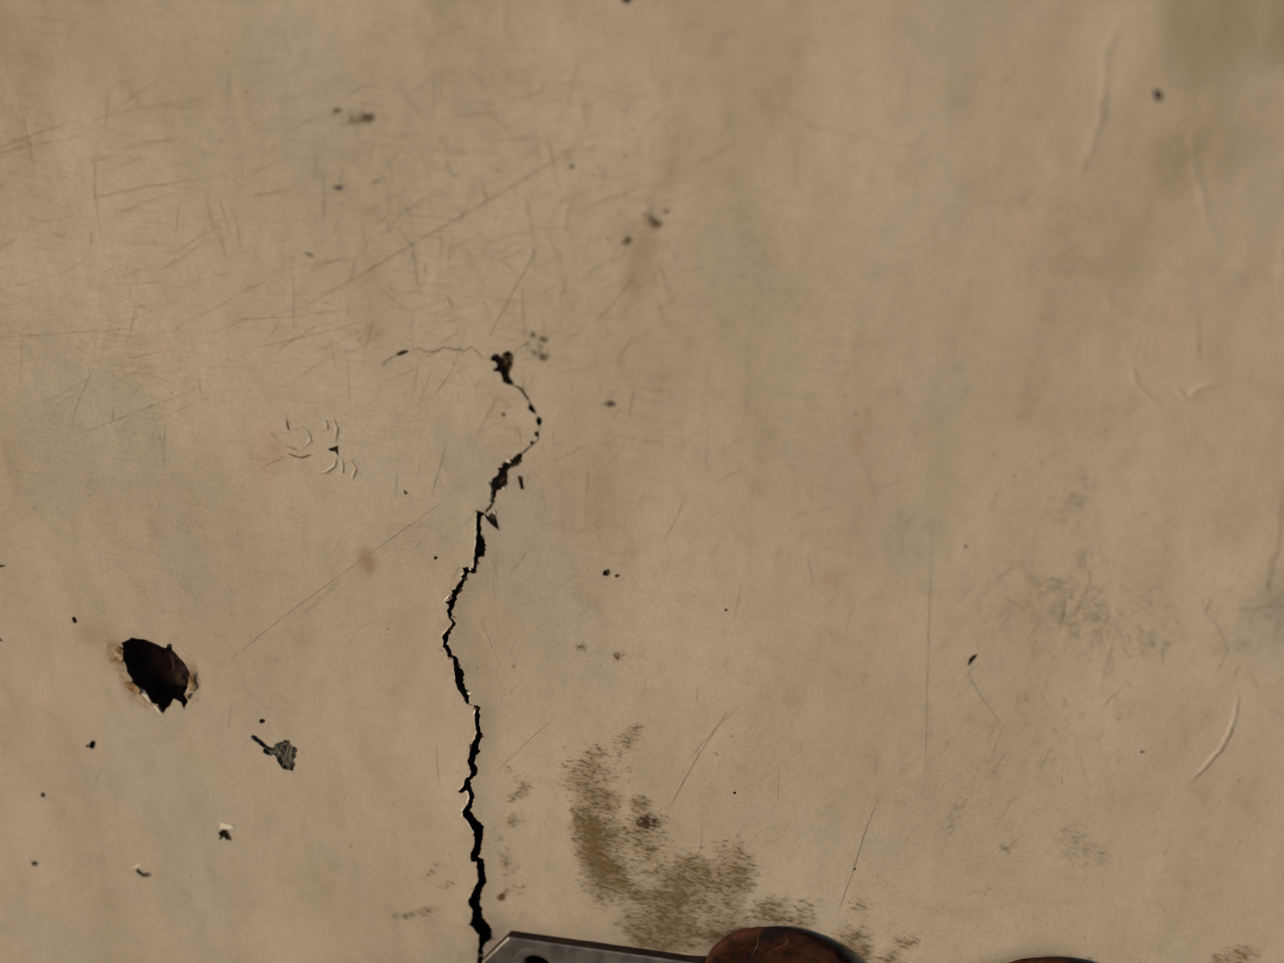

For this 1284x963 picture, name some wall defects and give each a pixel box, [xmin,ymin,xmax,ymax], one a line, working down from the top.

peeling [111,647,123,663]
crack [384,342,542,956]
peeling [124,681,162,714]
peeling [248,719,297,771]
water stain [562,726,815,952]
water stain [831,929,916,963]